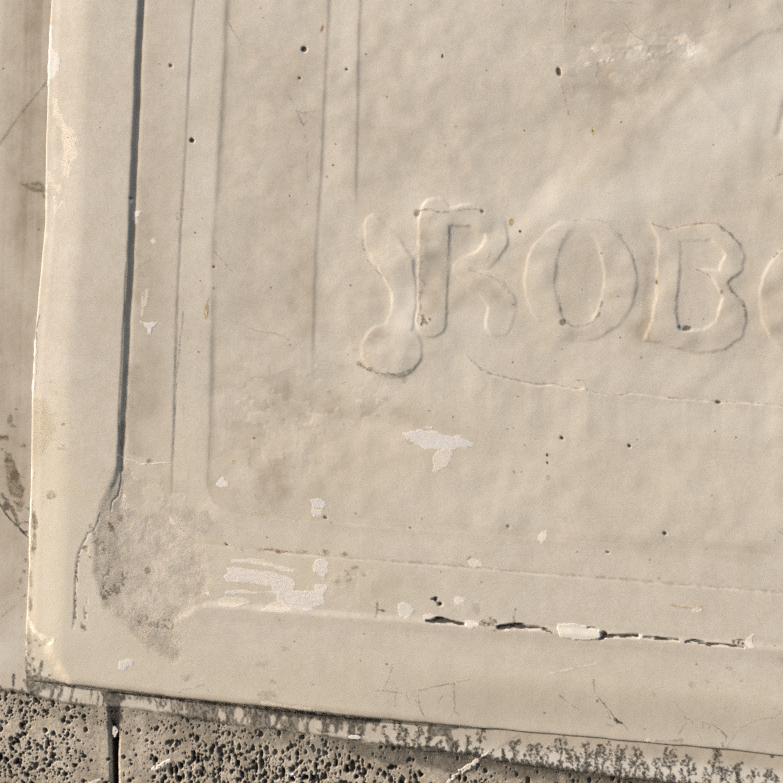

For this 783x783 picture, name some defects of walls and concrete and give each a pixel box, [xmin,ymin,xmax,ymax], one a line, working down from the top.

peeling [47,26,60,85]
crack [0,504,29,537]
damp [23,647,641,783]